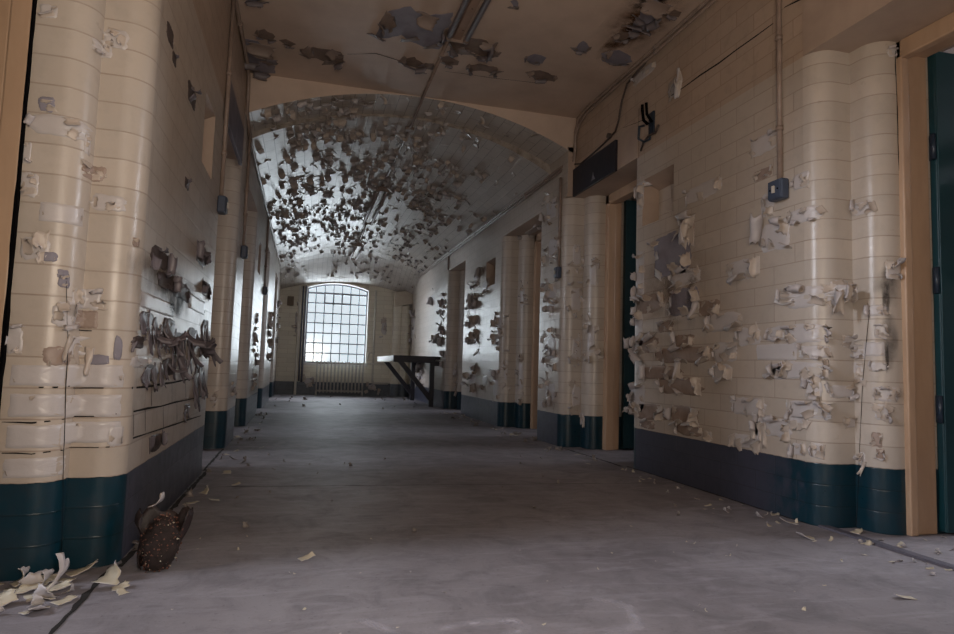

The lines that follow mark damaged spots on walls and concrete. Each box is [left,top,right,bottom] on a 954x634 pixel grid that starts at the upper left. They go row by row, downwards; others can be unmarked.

peeling [367,6,504,78]
peeling [524,54,558,84]
peeling [622,0,681,39]
peeling [250,97,487,290]
peeling [3,96,223,478]
peeling [251,300,298,391]
peeling [407,304,416,353]
peeling [415,363,424,387]
peeling [426,267,524,405]
peeling [537,278,561,409]
peeling [621,210,890,458]
peeling [852,386,902,476]